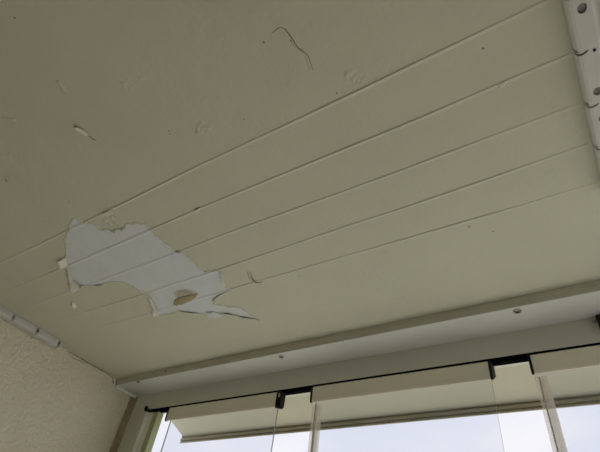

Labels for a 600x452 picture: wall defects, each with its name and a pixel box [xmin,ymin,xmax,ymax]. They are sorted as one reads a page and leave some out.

crack [272,27,313,71]
peeling [57,217,260,321]